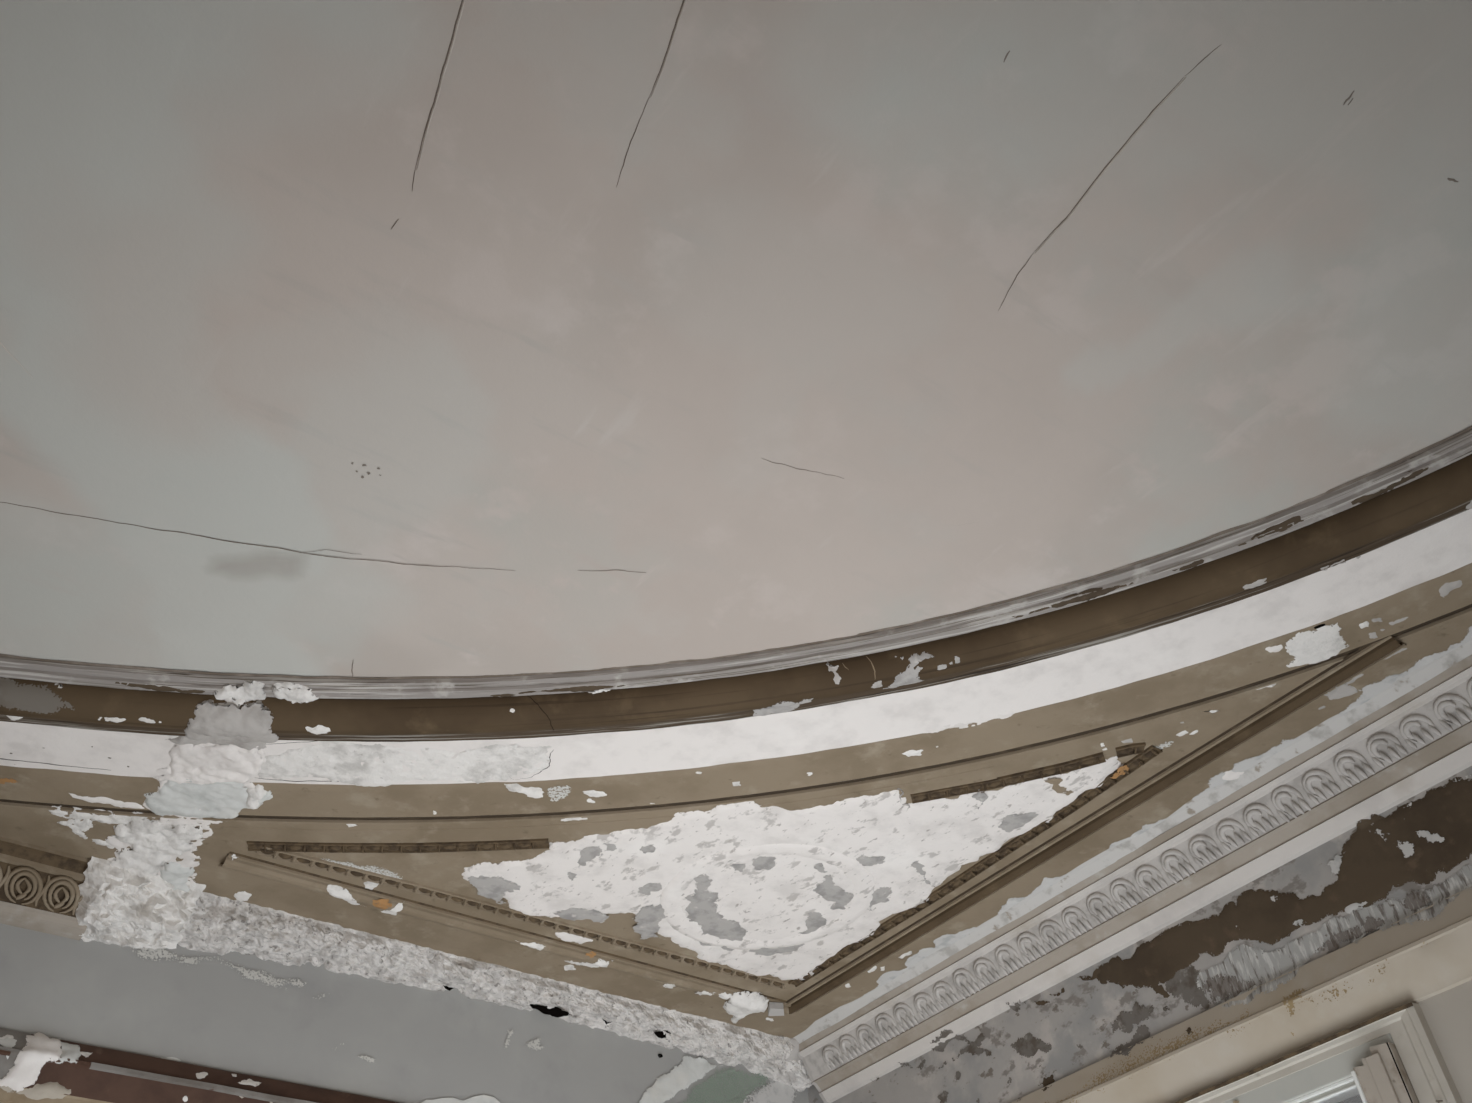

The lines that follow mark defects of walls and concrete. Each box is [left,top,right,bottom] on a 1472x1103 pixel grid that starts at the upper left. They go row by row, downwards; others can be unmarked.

crack [391,0,465,229]
crack [617,0,686,185]
crack [998,46,1219,311]
crack [1,502,514,571]
peeling [98,717,180,739]
peeling [1154,722,1198,749]
peeling [1222,770,1244,781]
peeling [57,819,114,849]
flaking render [143,738,1133,1092]
peeling [1082,775,1472,989]
peeling [0,1035,17,1059]
peeling [232,1074,260,1098]